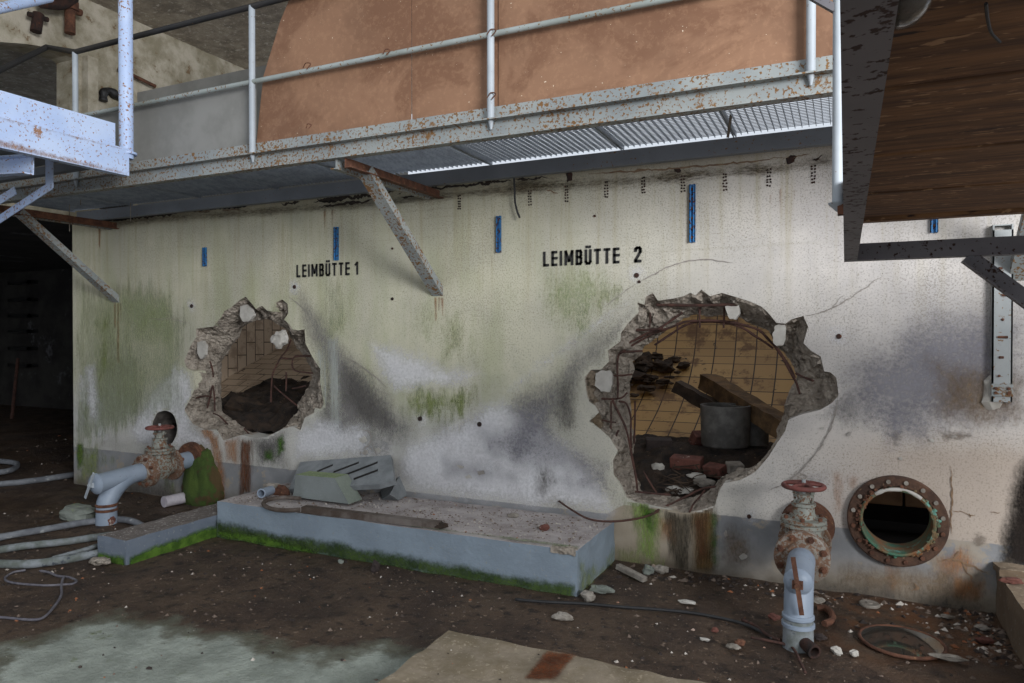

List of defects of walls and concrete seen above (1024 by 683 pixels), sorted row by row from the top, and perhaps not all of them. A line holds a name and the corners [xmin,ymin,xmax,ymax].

crack [602,259,732,309]
crack [806,278,880,316]
leakage [133,369,208,443]
spalling [153,297,324,444]
rust [202,430,281,493]
leakage [298,310,403,454]
leakage [376,348,461,389]
leakage [404,367,607,509]
spalling [585,290,838,513]
crack [770,396,838,490]
leakage [859,321,991,432]
rust [662,508,716,571]